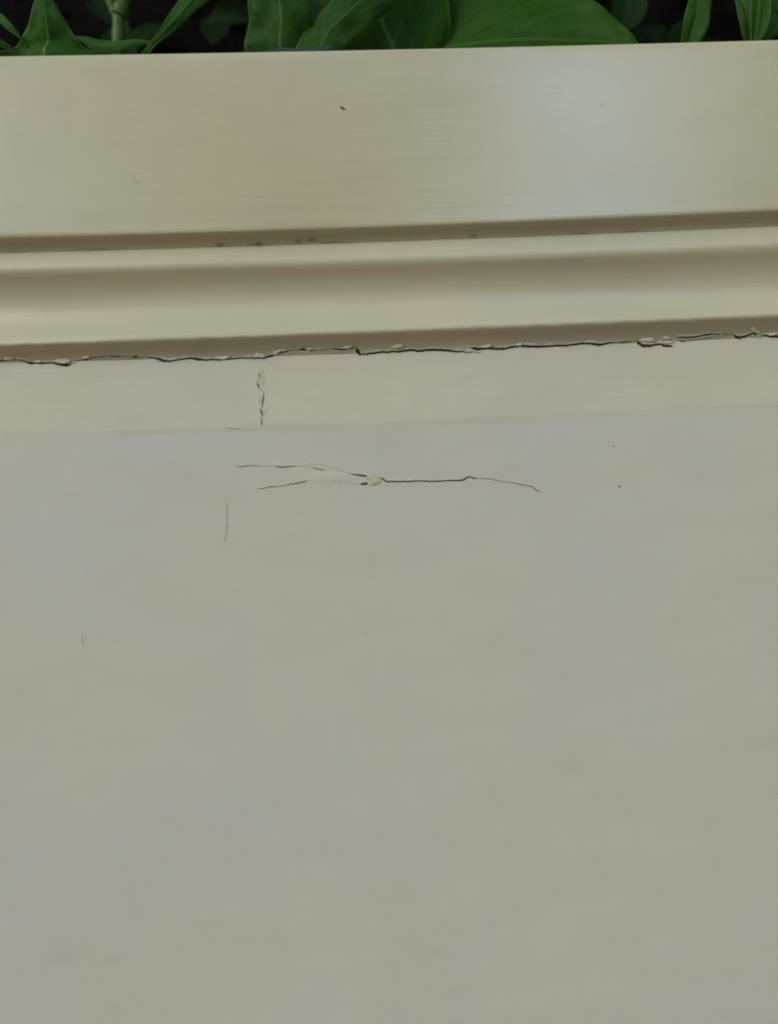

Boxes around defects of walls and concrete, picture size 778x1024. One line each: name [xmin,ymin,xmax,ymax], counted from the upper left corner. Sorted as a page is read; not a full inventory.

crack [0,327,778,430]
crack [238,463,540,492]